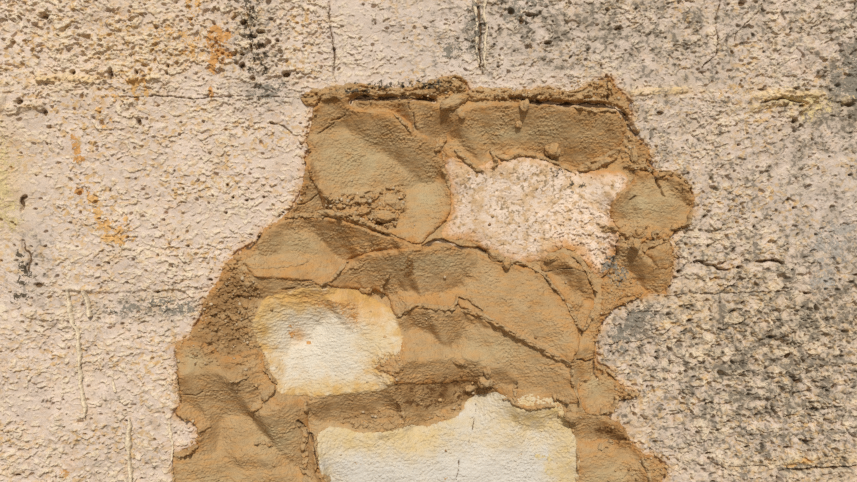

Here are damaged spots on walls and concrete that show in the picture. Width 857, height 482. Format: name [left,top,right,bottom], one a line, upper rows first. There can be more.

crack [475,3,483,71]
crack [701,4,758,73]
flaking render [441,155,629,278]
crack [721,464,857,482]